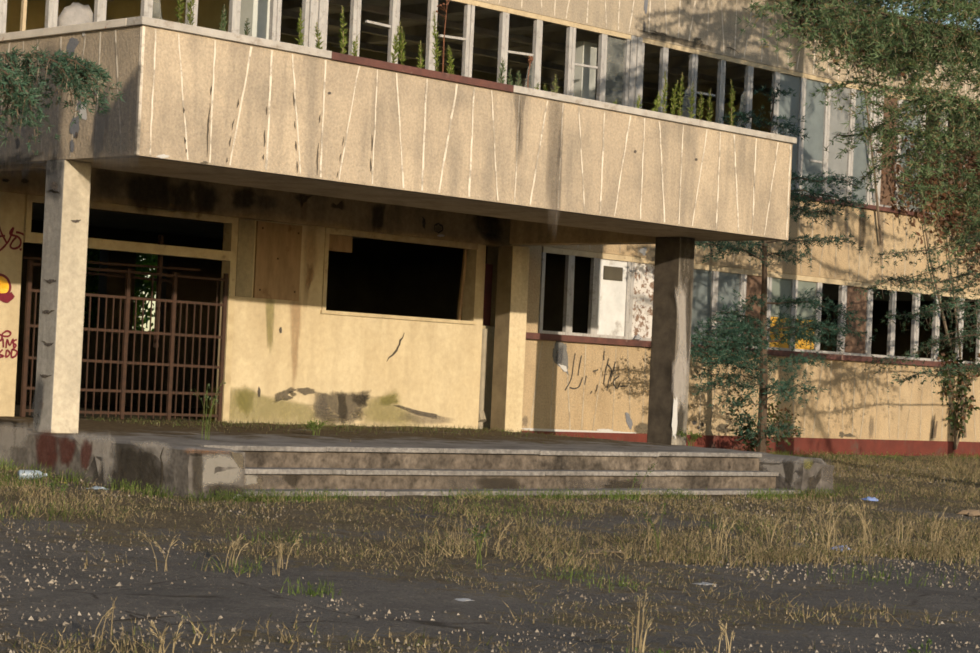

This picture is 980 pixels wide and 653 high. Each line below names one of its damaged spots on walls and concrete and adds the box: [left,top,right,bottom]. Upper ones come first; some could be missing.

damp [129,176,215,212]
peeling [553,341,569,375]